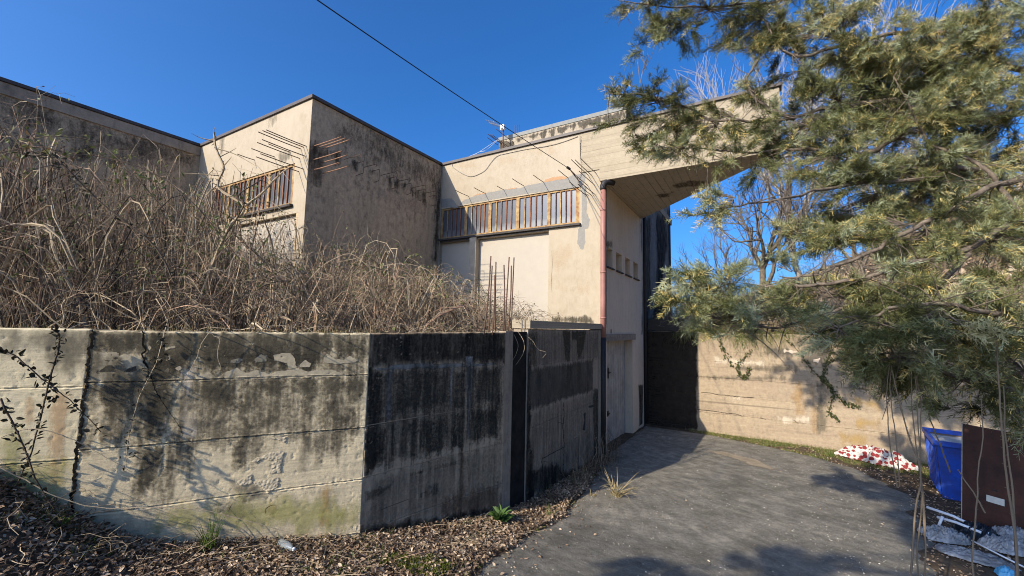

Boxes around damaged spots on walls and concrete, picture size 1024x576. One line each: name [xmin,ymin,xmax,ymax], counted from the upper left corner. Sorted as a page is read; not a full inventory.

leakage [309,128,441,261]
crack [69,329,96,512]
leakage [37,330,505,497]
peeling [196,353,358,380]
leakage [525,315,598,502]
leakage [364,508,493,534]